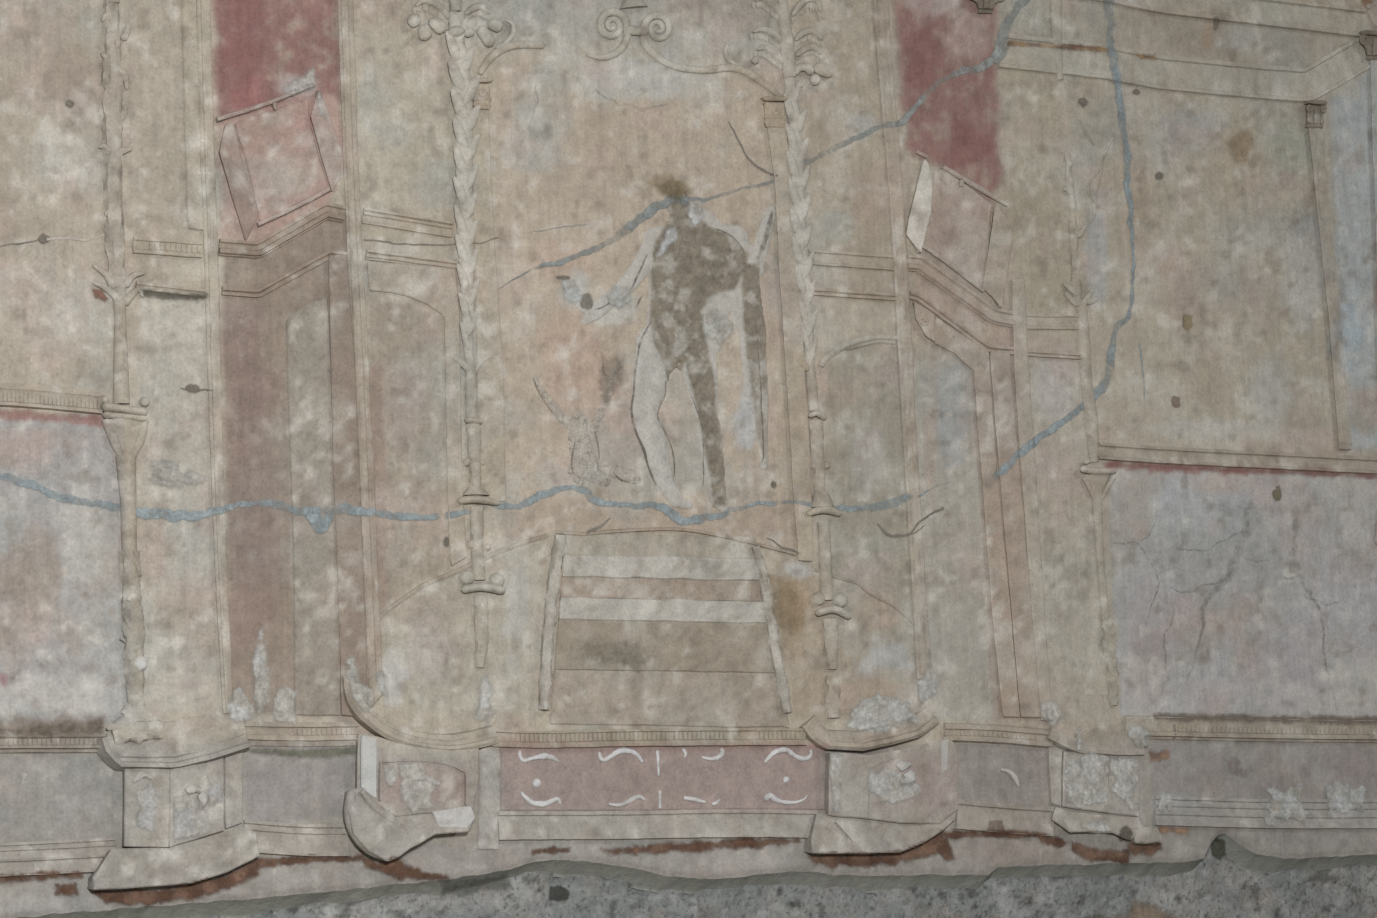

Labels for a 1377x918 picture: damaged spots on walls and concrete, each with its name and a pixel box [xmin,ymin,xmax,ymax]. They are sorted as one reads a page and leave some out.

peeling [687,200,704,226]
peeling [656,227,677,257]
spalling [703,309,733,344]
spalling [227,629,297,725]
spalling [847,663,939,732]
spalling [384,761,437,814]
spalling [1062,726,1151,841]
peeling [1264,783,1309,826]
peeling [1326,782,1367,817]
corrosion [532,846,569,854]
corrosion [607,827,1188,868]
corrosion [0,854,449,905]